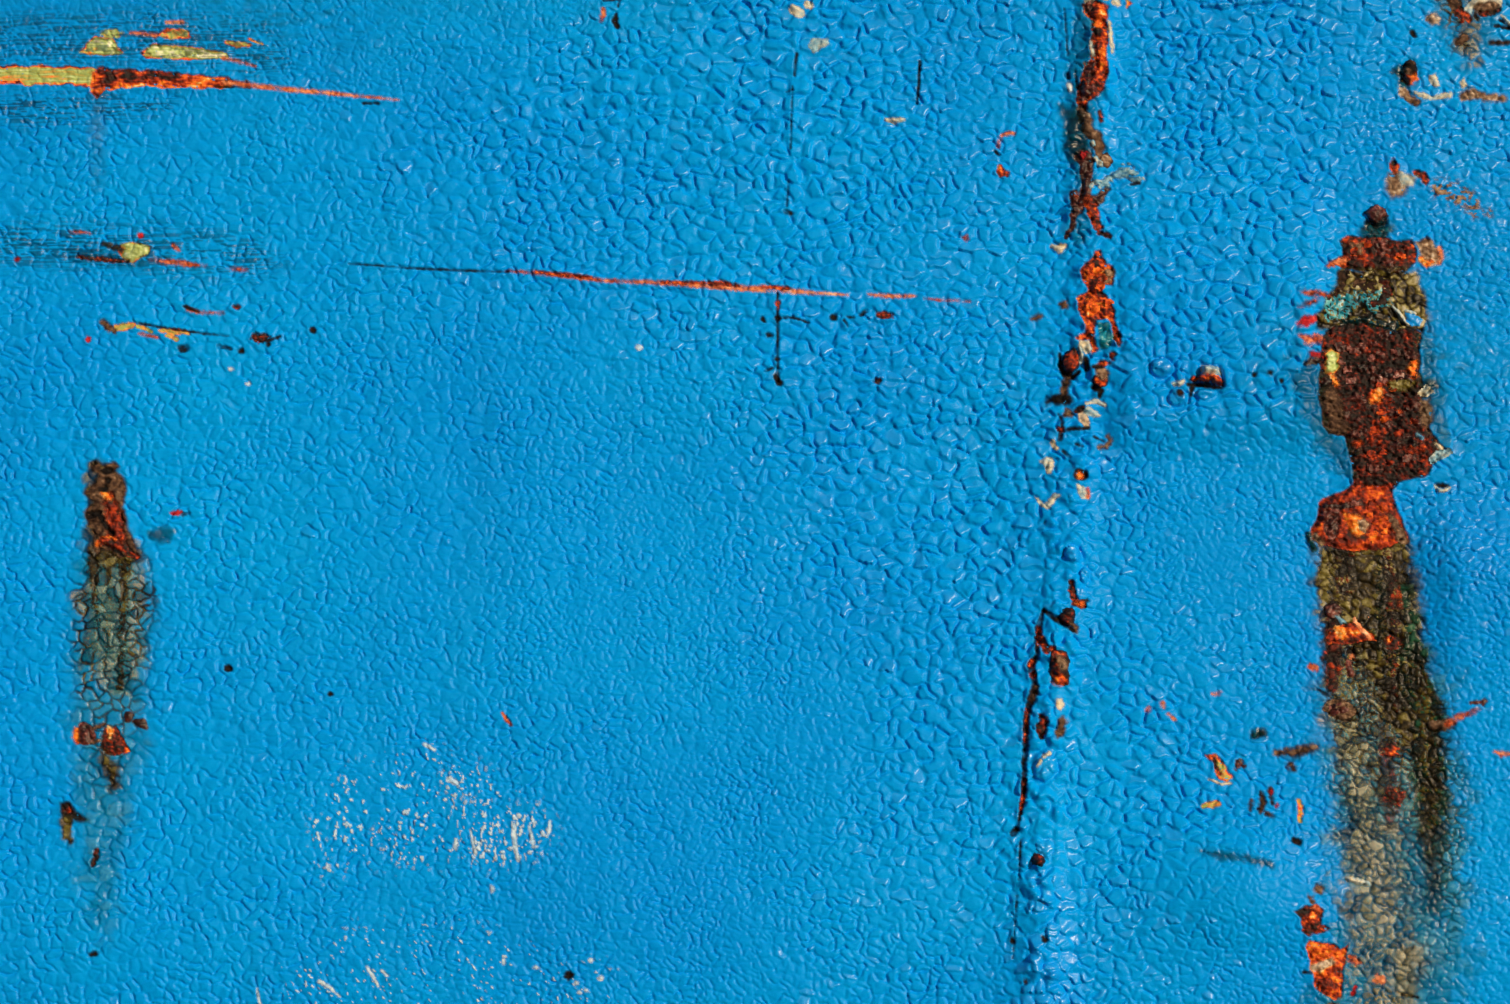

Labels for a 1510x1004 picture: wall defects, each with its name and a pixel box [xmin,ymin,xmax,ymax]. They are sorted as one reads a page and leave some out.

corrosion [1436,0,1481,66]
corrosion [1059,0,1132,367]
corrosion [1317,236,1453,489]
corrosion [1074,468,1088,480]
corrosion [72,461,156,790]
corrosion [1068,580,1089,609]
corrosion [1036,714,1049,739]
corrosion [1315,542,1448,942]
corrosion [60,802,87,844]
corrosion [1031,853,1046,867]
corrosion [1295,883,1385,1004]